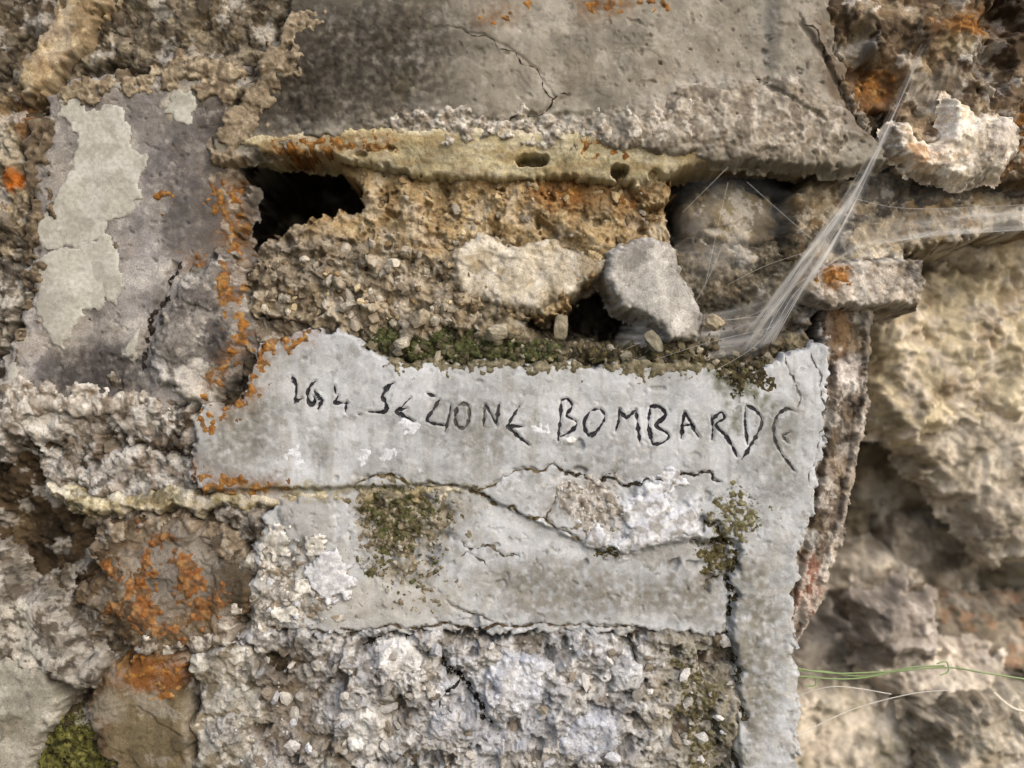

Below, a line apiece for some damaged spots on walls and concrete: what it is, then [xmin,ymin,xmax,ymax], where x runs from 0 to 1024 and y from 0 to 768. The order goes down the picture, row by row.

crack [451,26,569,121]
crack [461,541,519,565]
crack [354,463,721,554]
peeling [546,466,700,557]
crack [266,602,638,645]
crack [693,518,749,724]
crack [729,749,740,768]